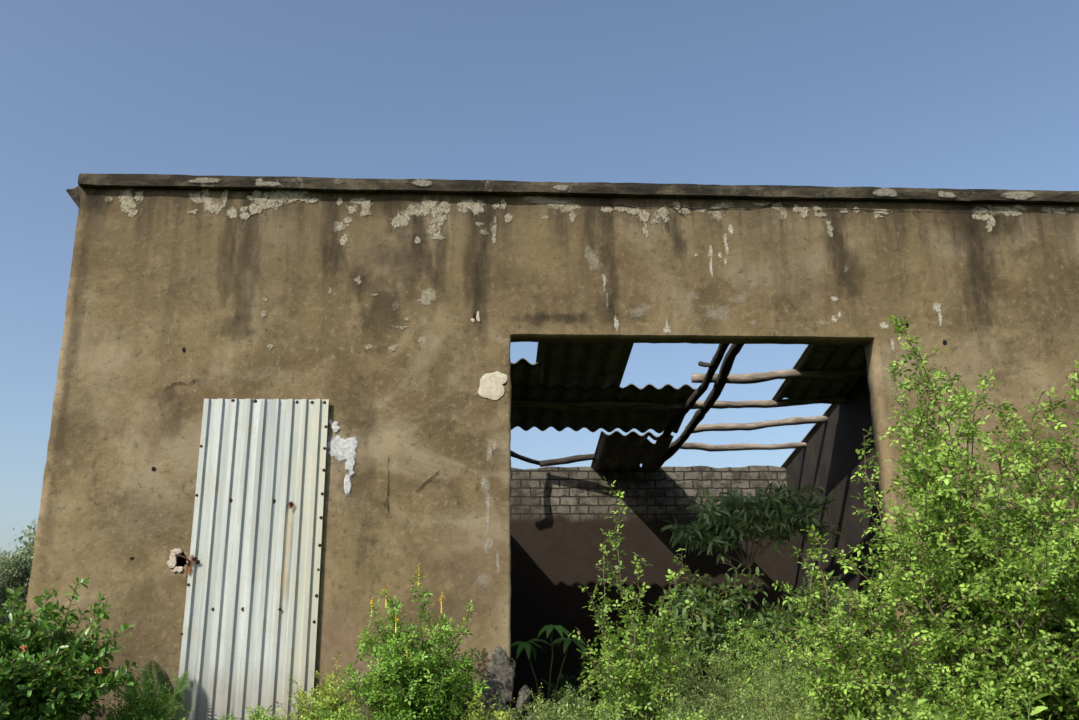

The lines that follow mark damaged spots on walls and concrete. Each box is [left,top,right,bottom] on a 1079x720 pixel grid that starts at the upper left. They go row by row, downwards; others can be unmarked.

peeling [104,188,144,217]
peeling [187,189,319,220]
peeling [333,198,373,246]
peeling [389,197,513,244]
peeling [600,201,733,238]
peeling [753,202,833,237]
peeling [971,205,1028,232]
leakage [695,225,733,276]
peeling [417,289,436,305]
flaking render [167,549,183,573]